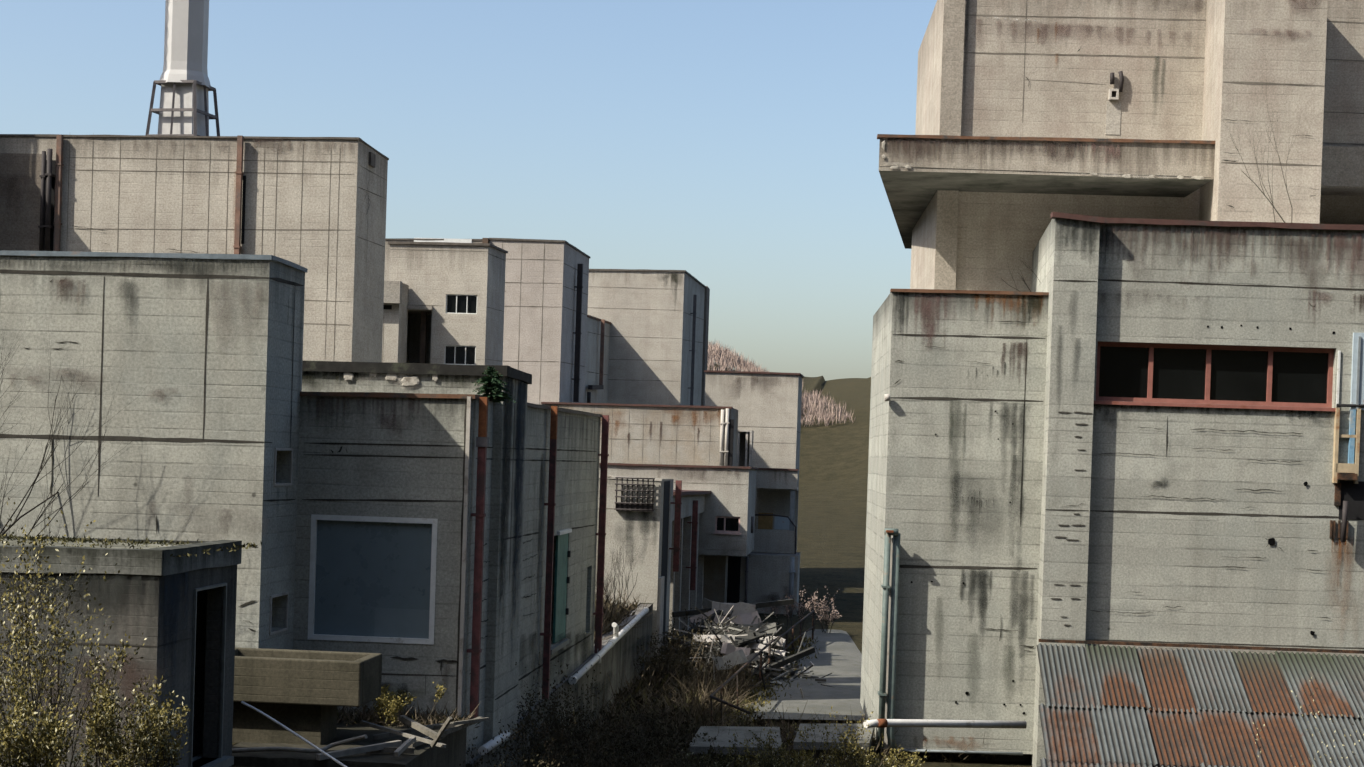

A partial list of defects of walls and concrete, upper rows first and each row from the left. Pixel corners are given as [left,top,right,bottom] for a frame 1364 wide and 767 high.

water stain [497,376,527,578]
water stain [961,569,992,615]